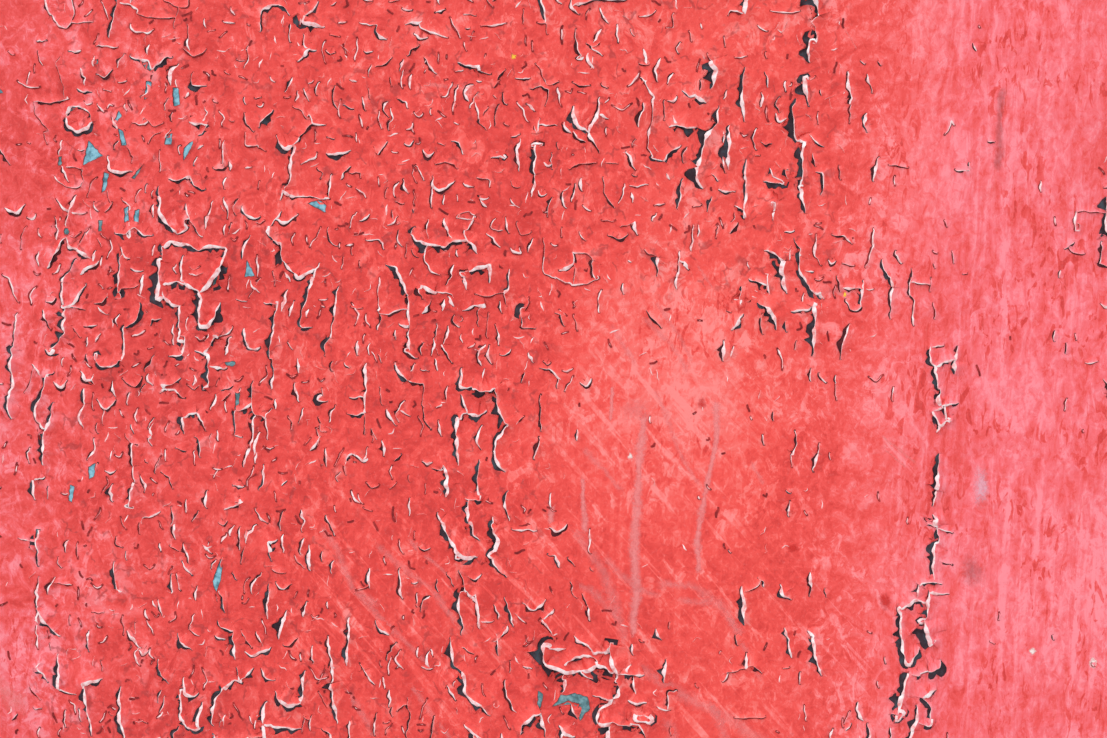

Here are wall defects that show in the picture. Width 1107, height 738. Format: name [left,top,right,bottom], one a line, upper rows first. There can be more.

crack [0,225,37,420]
crack [7,0,252,156]
crack [151,55,300,235]
crack [316,0,771,540]
peeling [556,8,606,108]
peeling [604,0,857,386]
peeling [921,337,981,436]
peeling [1093,157,1107,240]
crack [18,391,597,738]
peeling [481,589,678,738]
crack [719,571,831,721]
peeling [829,525,955,738]